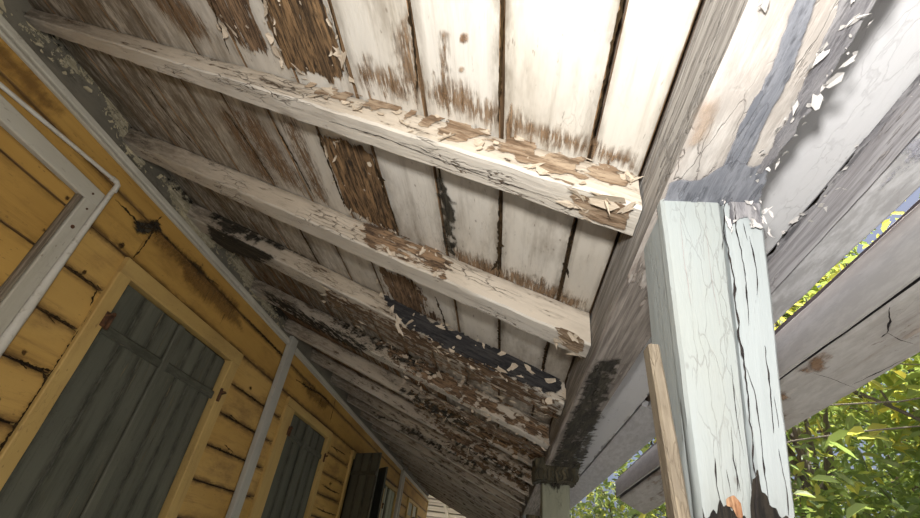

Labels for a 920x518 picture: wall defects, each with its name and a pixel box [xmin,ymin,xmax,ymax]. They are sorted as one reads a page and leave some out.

peeling [0,0,285,327]
crack [117,201,283,356]
peeling [317,134,453,280]
peeling [204,0,644,222]
peeling [320,265,569,496]
peeling [553,329,583,359]
crack [705,204,789,518]
peeling [750,0,876,183]
peeling [722,75,920,263]